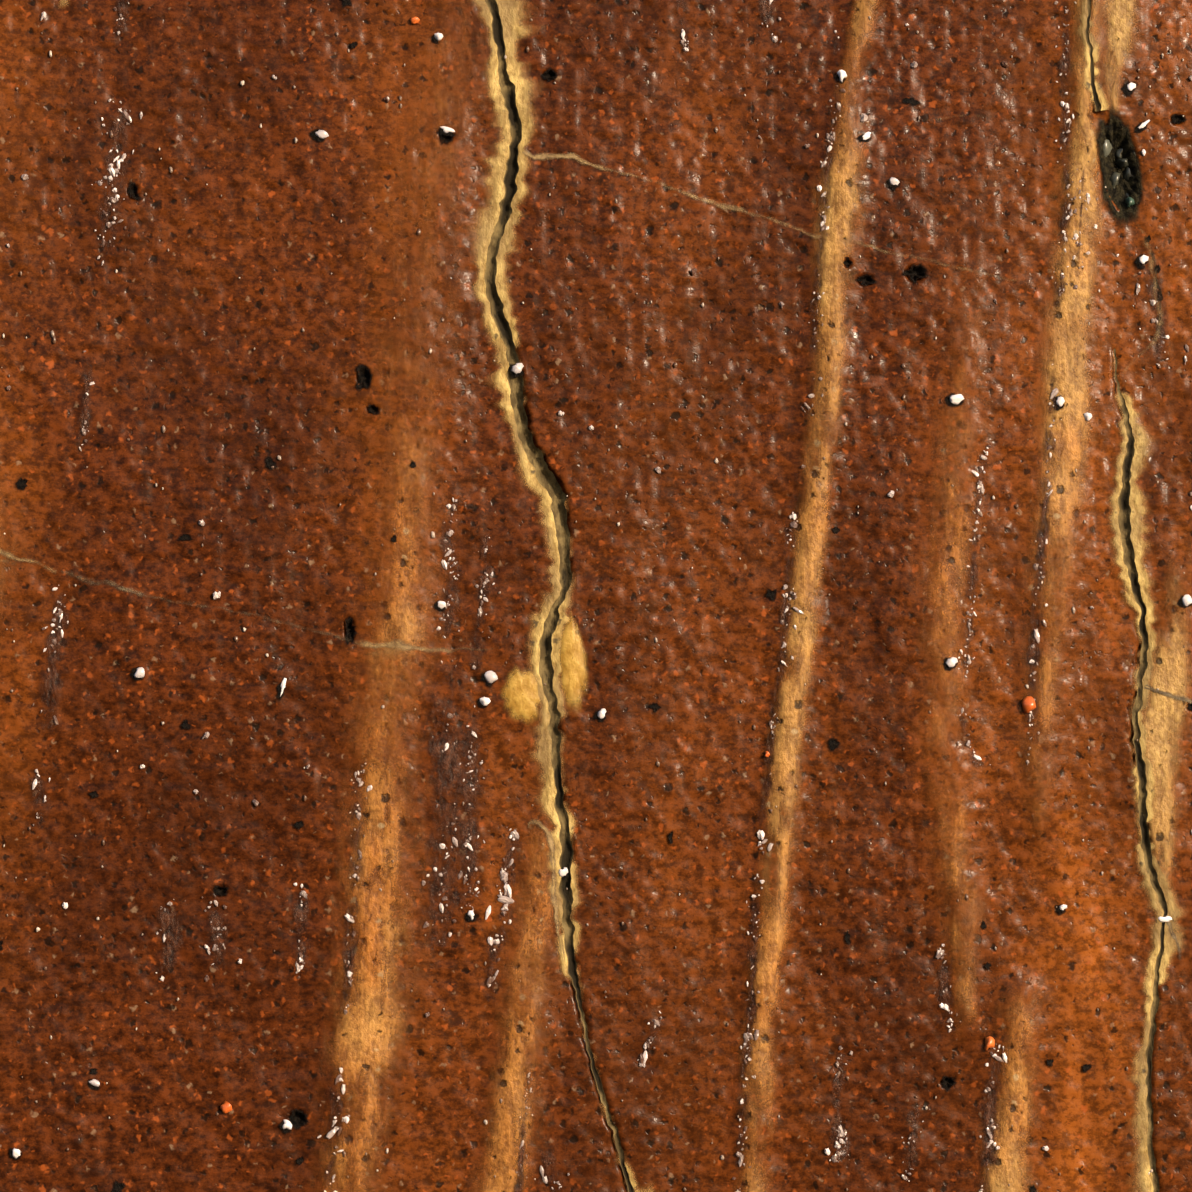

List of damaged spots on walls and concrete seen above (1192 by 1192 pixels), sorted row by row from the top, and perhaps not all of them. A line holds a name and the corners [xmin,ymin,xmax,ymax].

crack [474,0,653,1192]
crack [687,193,743,210]
damp [743,0,877,1192]
damp [986,1000,1035,1192]
damp [1036,0,1135,736]
spalling [1096,109,1143,224]
crack [1111,349,1192,1192]
crack [1152,251,1162,304]